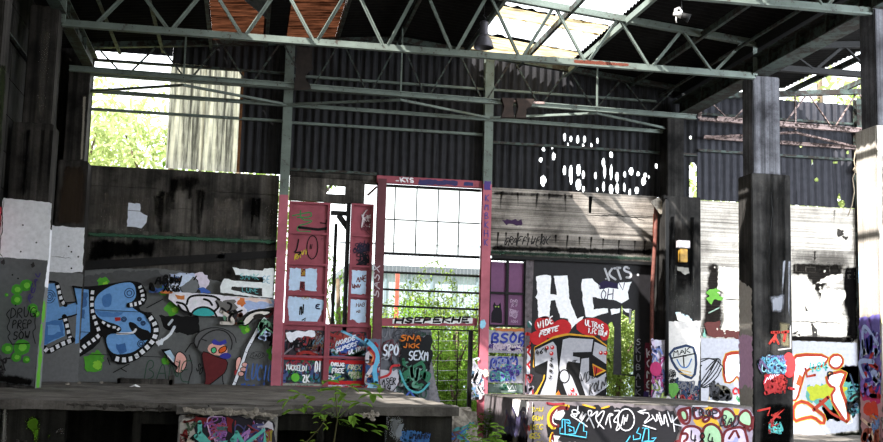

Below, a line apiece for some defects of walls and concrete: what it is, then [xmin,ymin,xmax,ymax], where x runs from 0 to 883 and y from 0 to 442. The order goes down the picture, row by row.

water stain [102,176,261,234]
peeling [791,270,847,337]